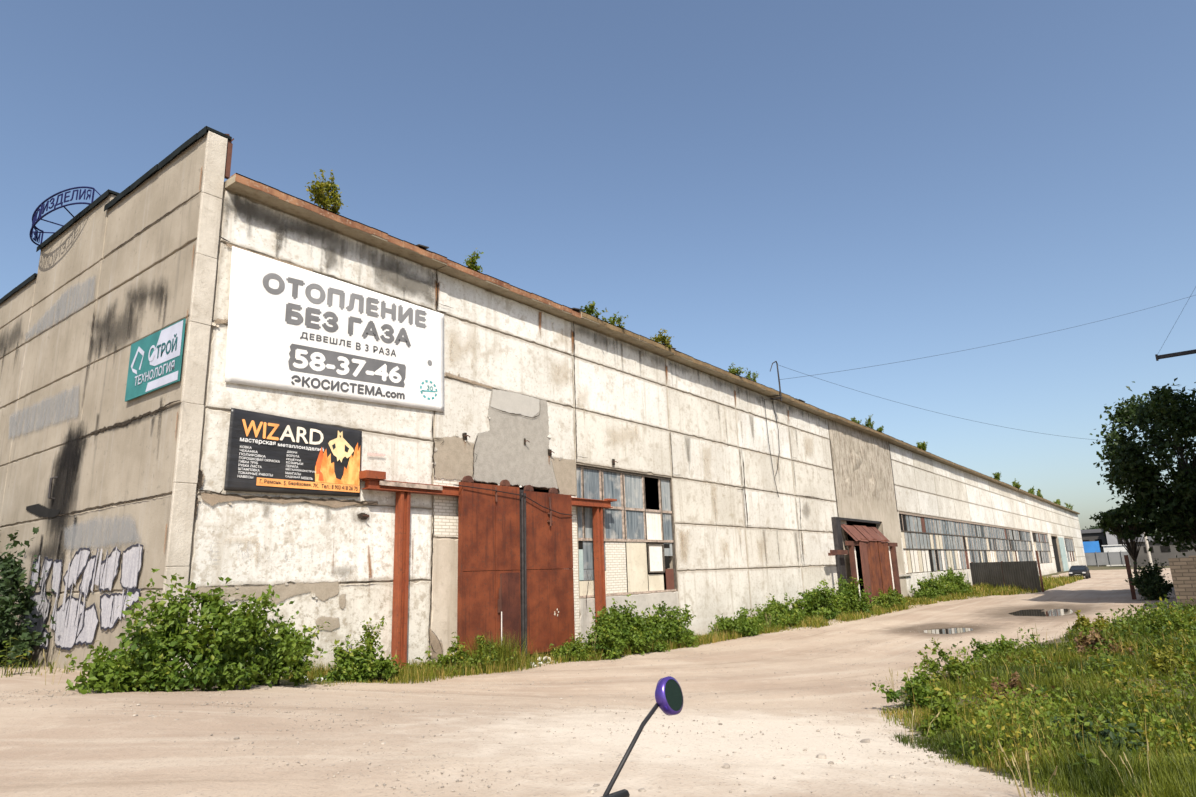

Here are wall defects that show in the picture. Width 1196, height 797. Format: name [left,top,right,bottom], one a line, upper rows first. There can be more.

damp [0,278,95,352]
damp [9,285,166,438]
peeling [432,371,577,496]
damp [29,517,138,576]
peeling [187,581,346,631]